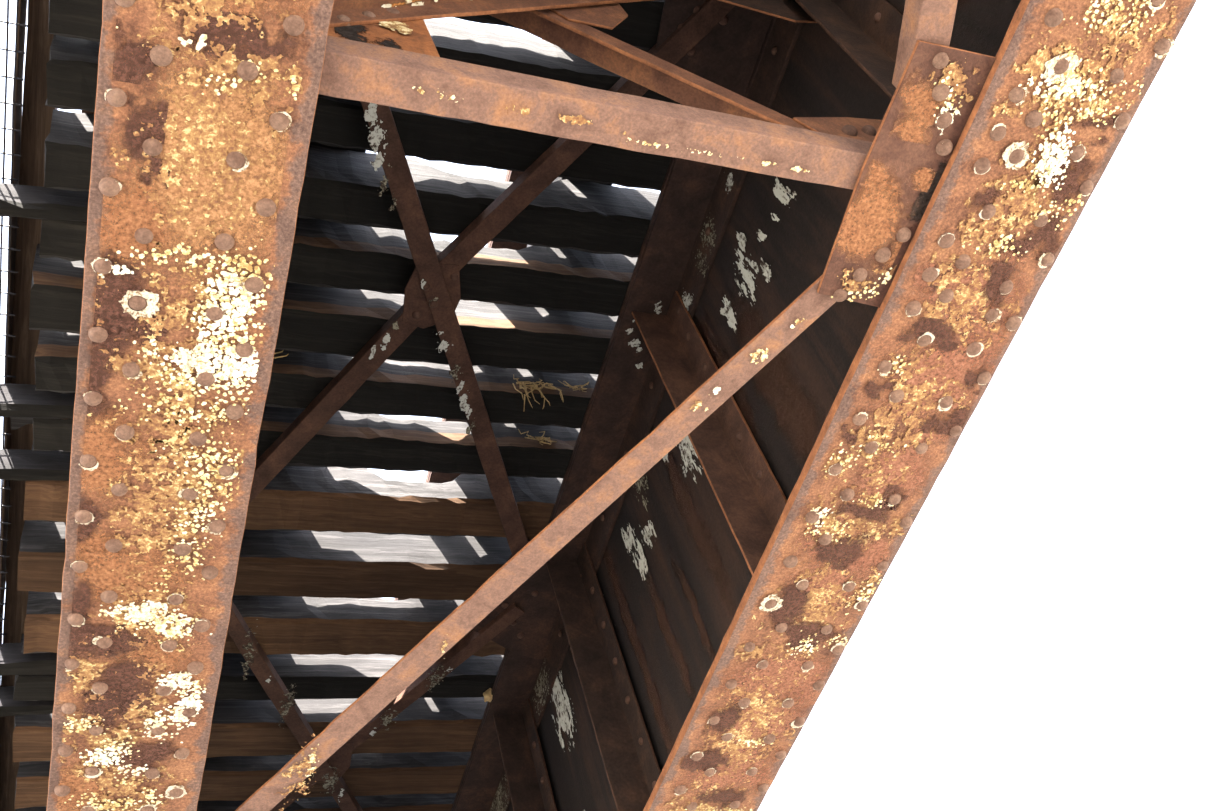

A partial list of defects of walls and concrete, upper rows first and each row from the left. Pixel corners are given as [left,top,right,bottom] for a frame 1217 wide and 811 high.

rust [100,51,288,280]
peeling [559,114,593,126]
rust [835,160,936,270]
peeling [60,0,303,811]
peeling [625,320,643,369]
rust [732,351,820,456]
peeling [663,0,1178,811]
rust [851,257,1029,504]
rust [74,523,194,605]
peeling [621,475,657,581]
peeling [273,733,345,811]
rust [674,649,831,793]